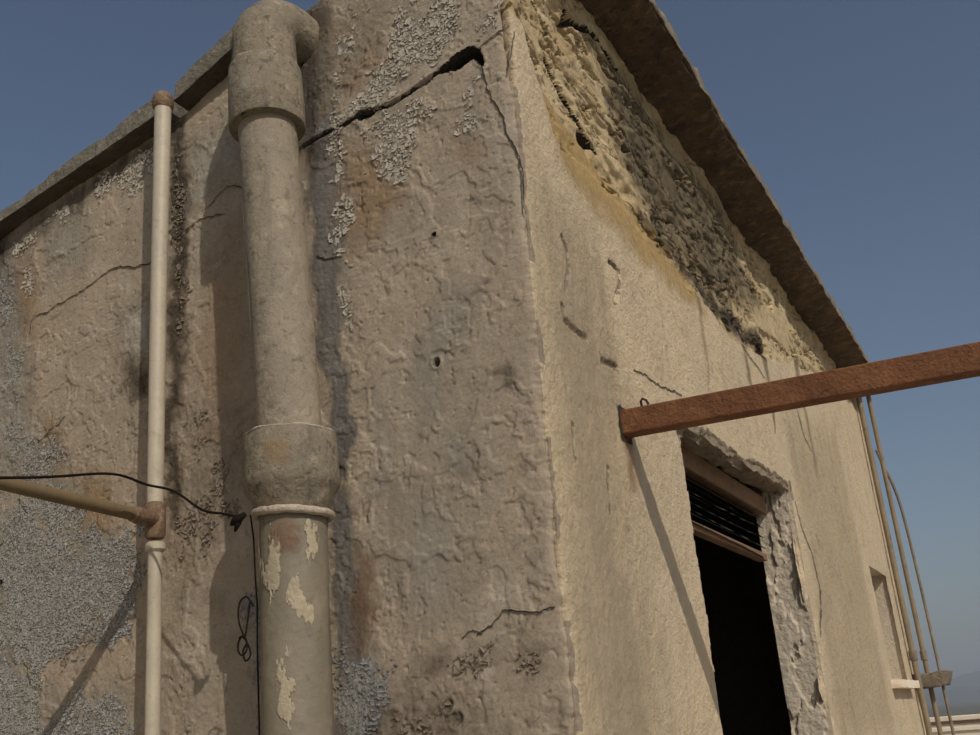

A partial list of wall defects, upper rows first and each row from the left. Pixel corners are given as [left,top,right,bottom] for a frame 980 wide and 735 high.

crack [556,2,618,72]
crack [308,25,527,213]
crack [541,50,597,156]
peeling [0,267,69,489]
crack [29,262,151,334]
water stain [120,300,150,356]
water stain [300,41,380,735]
peeling [0,496,147,735]
peeling [239,515,314,686]
crack [461,606,555,638]
peeling [276,645,296,730]
peeling [331,642,439,735]